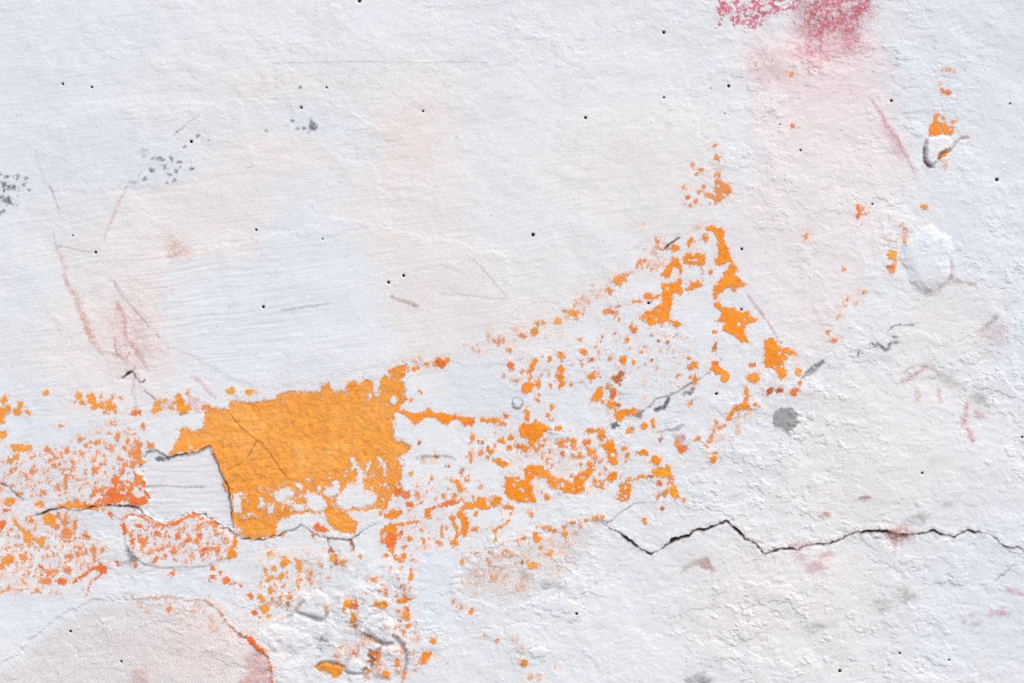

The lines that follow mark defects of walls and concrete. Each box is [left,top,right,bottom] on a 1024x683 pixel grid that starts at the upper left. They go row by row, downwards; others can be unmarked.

peeling [924,114,958,169]
peeling [682,142,733,207]
peeling [0,224,805,683]
crack [0,446,360,556]
crack [596,508,1023,555]